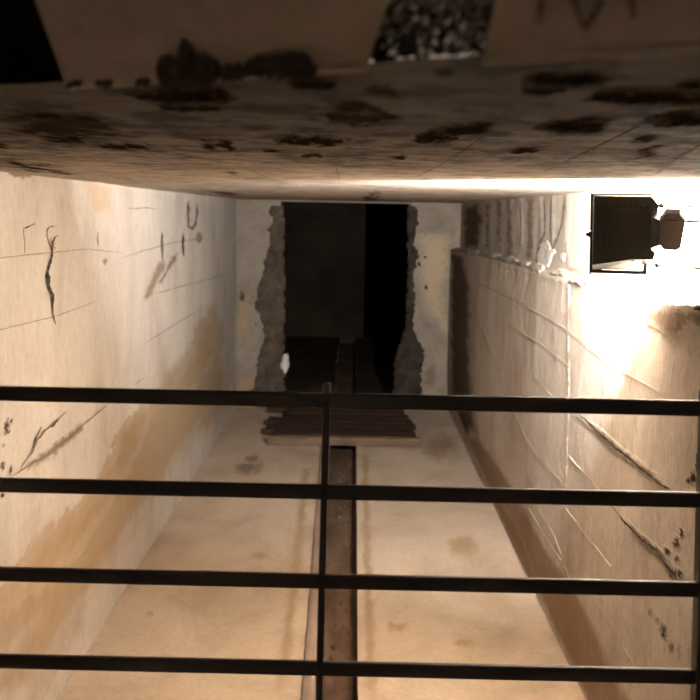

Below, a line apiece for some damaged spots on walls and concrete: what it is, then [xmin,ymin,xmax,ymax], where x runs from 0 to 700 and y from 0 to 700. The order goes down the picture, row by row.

crack [23,223,58,324]
flaking render [250,205,286,392]
flaking render [392,203,427,394]
water stain [134,287,257,391]
water stain [0,415,14,449]
crack [11,405,107,477]
water stain [81,404,256,481]
crack [579,414,670,491]
water stain [0,493,167,569]
crack [612,507,679,580]
water stain [0,582,121,655]
water stain [0,669,66,700]